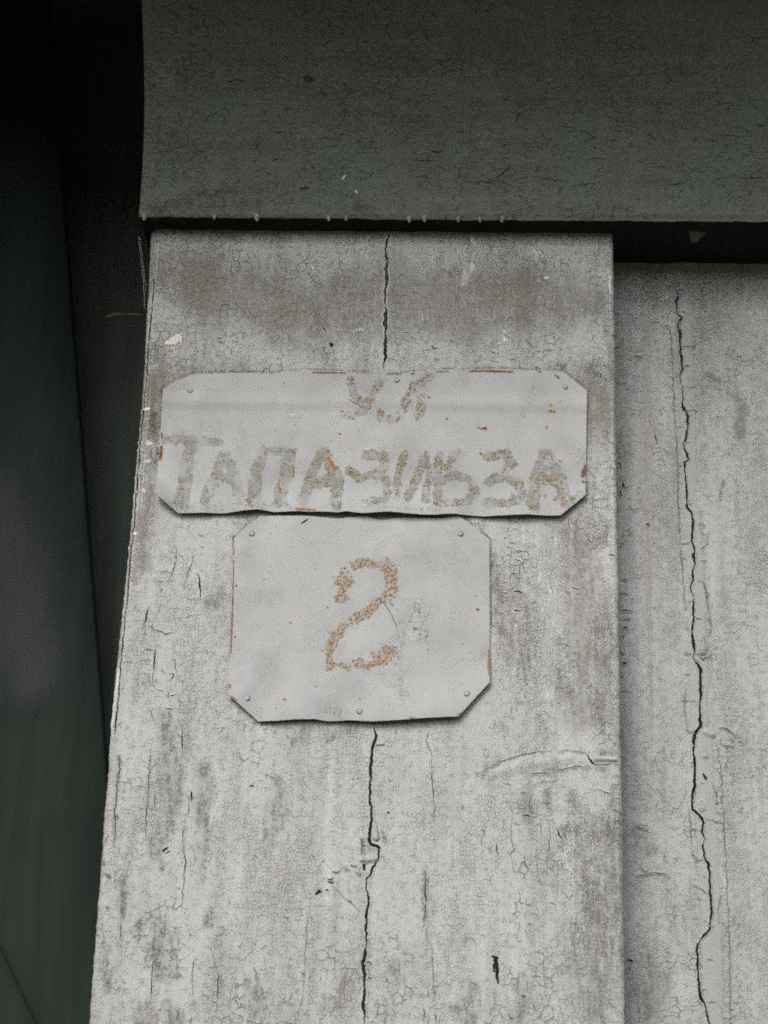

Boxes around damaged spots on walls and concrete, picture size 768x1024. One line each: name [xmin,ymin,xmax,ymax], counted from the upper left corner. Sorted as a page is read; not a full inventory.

crack [319,231,555,371]
crack [616,447,627,496]
crack [637,282,741,1024]
crack [296,723,382,1024]
crack [466,748,648,907]